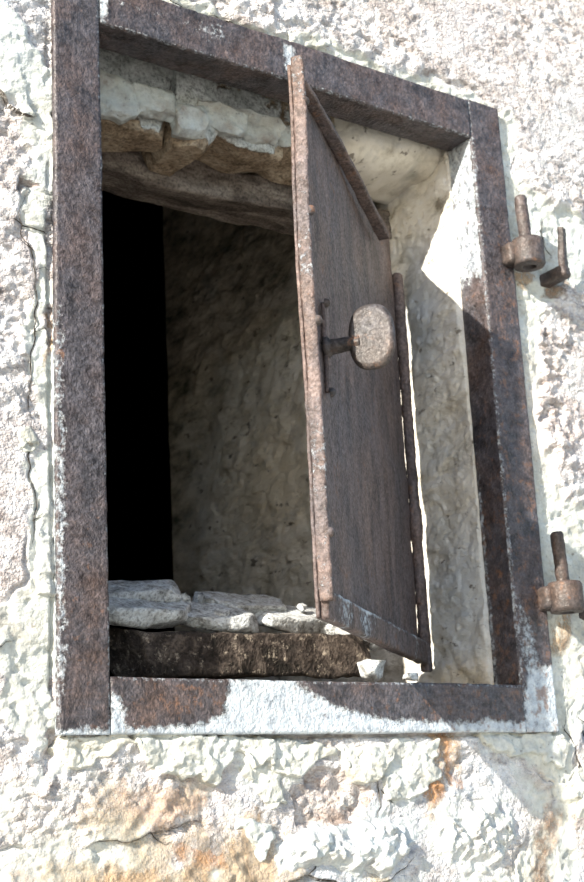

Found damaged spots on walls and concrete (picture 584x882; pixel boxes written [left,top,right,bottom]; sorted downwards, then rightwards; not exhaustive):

crack [0,89,34,118]
crack [14,187,49,417]
rust [545,281,568,299]
crack [27,442,40,544]
crack [564,712,584,768]
crack [86,821,198,848]
crack [290,866,337,882]